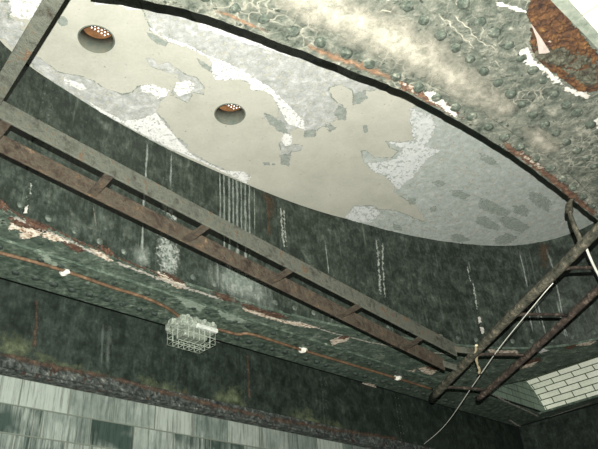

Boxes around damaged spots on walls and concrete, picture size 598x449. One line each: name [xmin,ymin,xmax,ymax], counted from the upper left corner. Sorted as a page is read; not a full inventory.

peeling [28,52,252,183]
damp [219,177,255,233]
peeling [94,0,389,166]
peeling [279,0,512,114]
peeling [345,80,598,246]
spalling [495,0,598,99]
peeling [6,205,221,311]
damp [157,236,179,274]
peeling [218,310,250,323]
damp [217,264,263,304]
spalling [296,320,399,349]
damp [376,241,386,300]